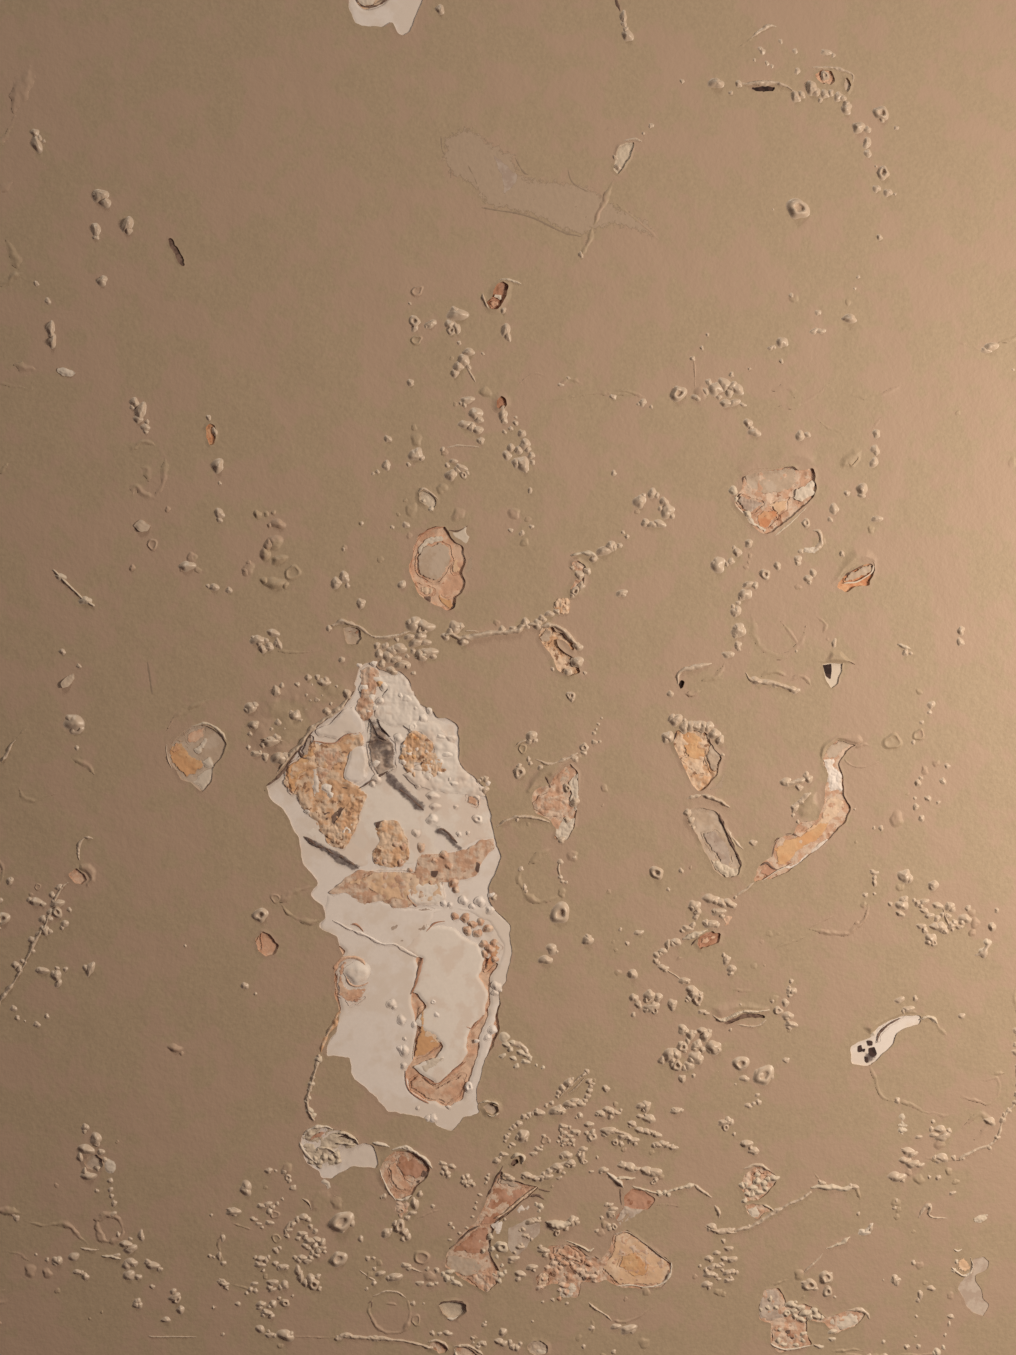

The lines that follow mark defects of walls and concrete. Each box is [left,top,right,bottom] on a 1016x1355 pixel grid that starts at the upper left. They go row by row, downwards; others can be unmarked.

peeling [345,0,426,38]
peeling [615,0,634,41]
peeling [728,444,821,538]
peeling [397,522,473,615]
peeling [165,699,230,795]
peeling [653,713,884,979]
peeling [252,908,282,960]
peeling [264,659,515,1134]
peeling [847,995,947,1069]
peeling [298,1123,721,1323]